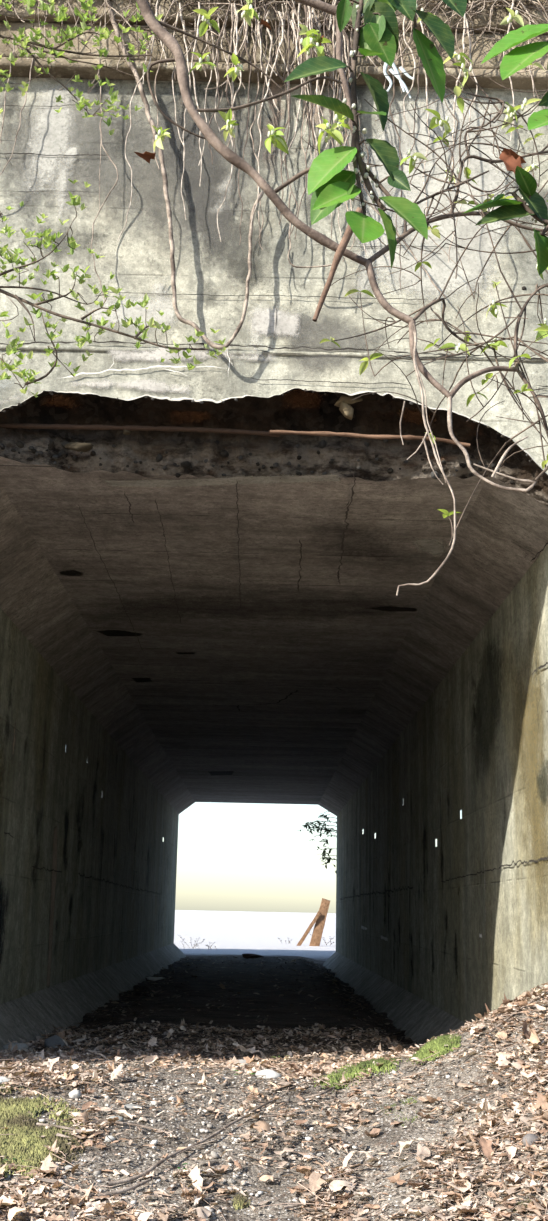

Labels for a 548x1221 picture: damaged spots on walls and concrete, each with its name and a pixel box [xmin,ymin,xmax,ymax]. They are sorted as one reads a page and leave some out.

damp [33,88,76,205]
damp [157,89,267,289]
damp [92,283,174,326]
peeling [110,347,273,362]
spalling [0,380,548,506]
crack [337,475,356,583]
damp [537,761,548,802]
crack [441,857,548,882]
damp [0,881,9,967]